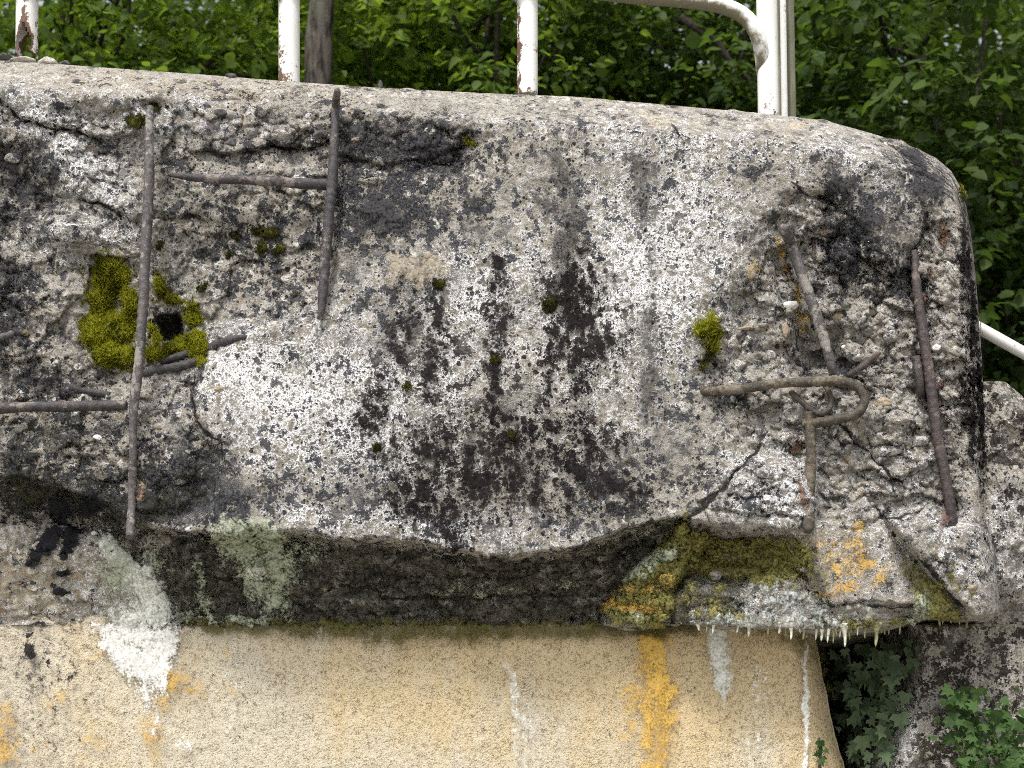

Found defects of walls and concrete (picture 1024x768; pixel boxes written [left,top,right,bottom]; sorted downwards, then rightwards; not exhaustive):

rust [939,223,952,255]
spalling [0,77,971,627]
leakage [0,134,988,768]
crack [679,443,762,533]
rust [618,629,679,768]